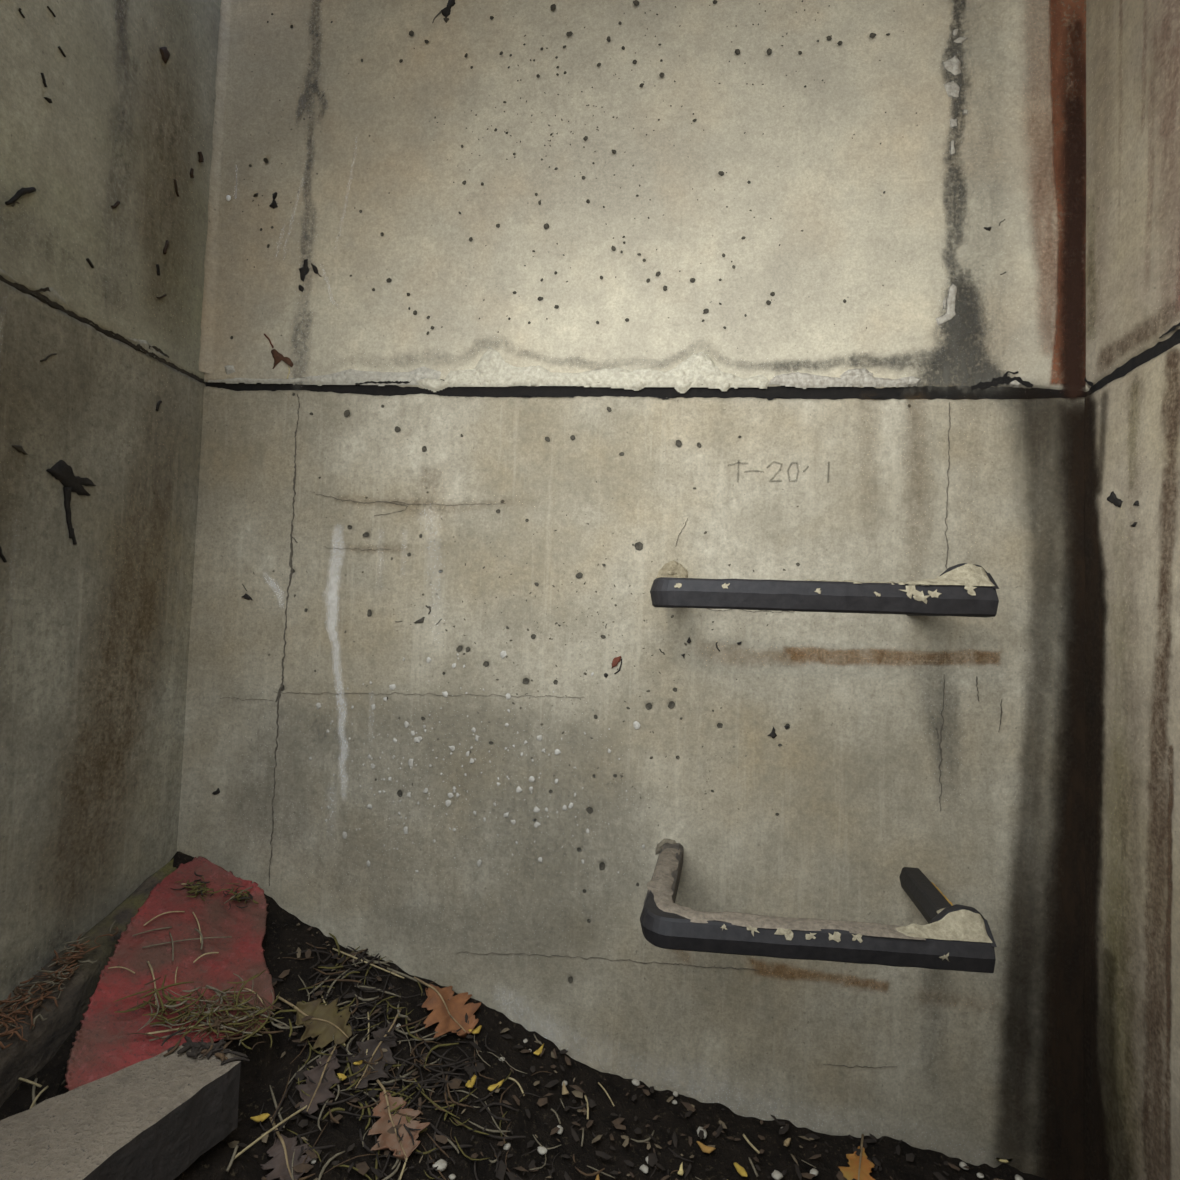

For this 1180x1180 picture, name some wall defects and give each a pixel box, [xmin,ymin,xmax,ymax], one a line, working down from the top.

water stain [297,0,326,270]
water stain [775,361,817,370]
water stain [850,0,1010,392]
rust [1035,0,1086,400]
crack [0,275,1180,886]
water stain [1000,392,1122,1180]